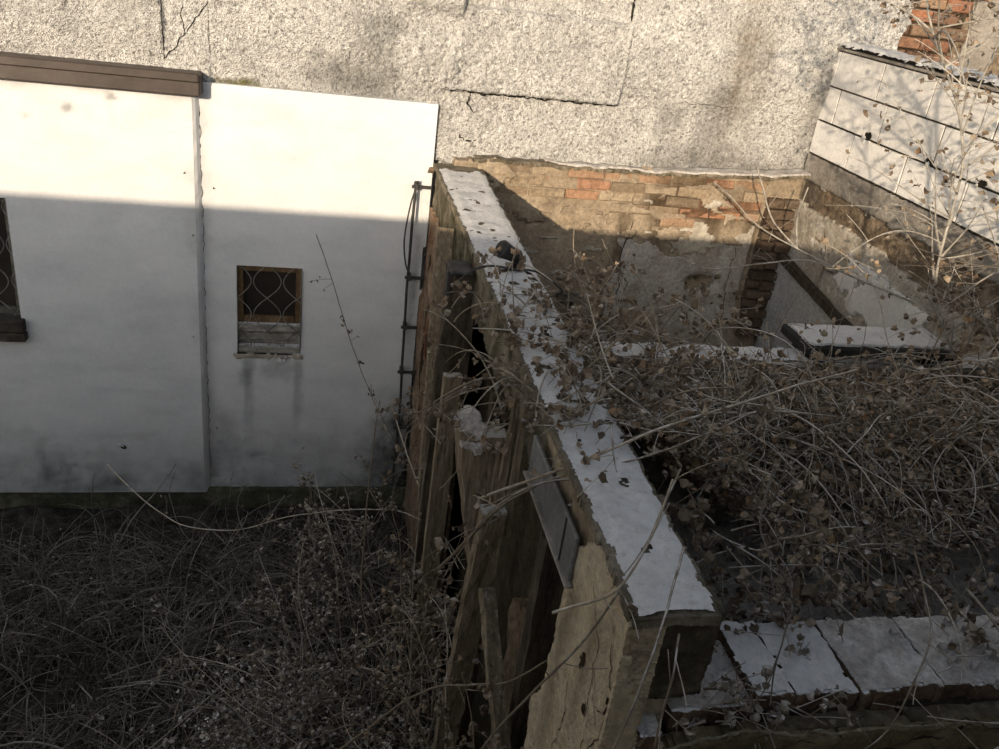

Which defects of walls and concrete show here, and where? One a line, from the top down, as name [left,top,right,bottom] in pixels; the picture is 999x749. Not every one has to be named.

crack [160,0,210,59]
spalling [893,0,989,66]
crack [445,86,617,113]
spalling [477,157,770,347]
spalling [800,180,999,340]
spalling [587,358,999,406]
crack [551,584,614,749]